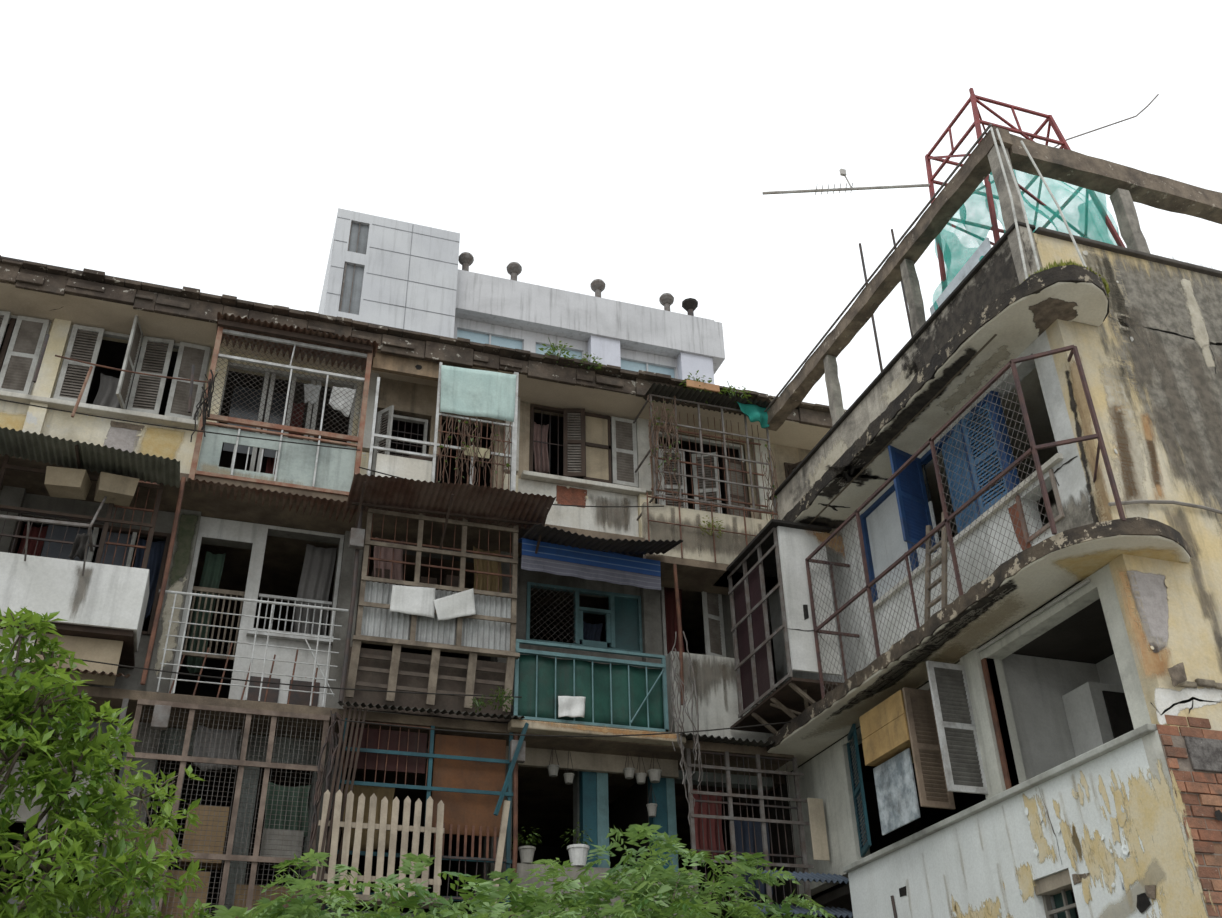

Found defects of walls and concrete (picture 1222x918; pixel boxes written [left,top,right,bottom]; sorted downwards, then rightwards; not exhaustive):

leakage [816,348,977,499]
leakage [902,232,1037,379]
spalling [1029,297,1079,337]
leakage [1090,249,1222,520]
crack [1110,317,1221,374]
peeling [1127,570,1170,653]
crack [1151,698,1212,715]
peeling [951,662,1222,918]